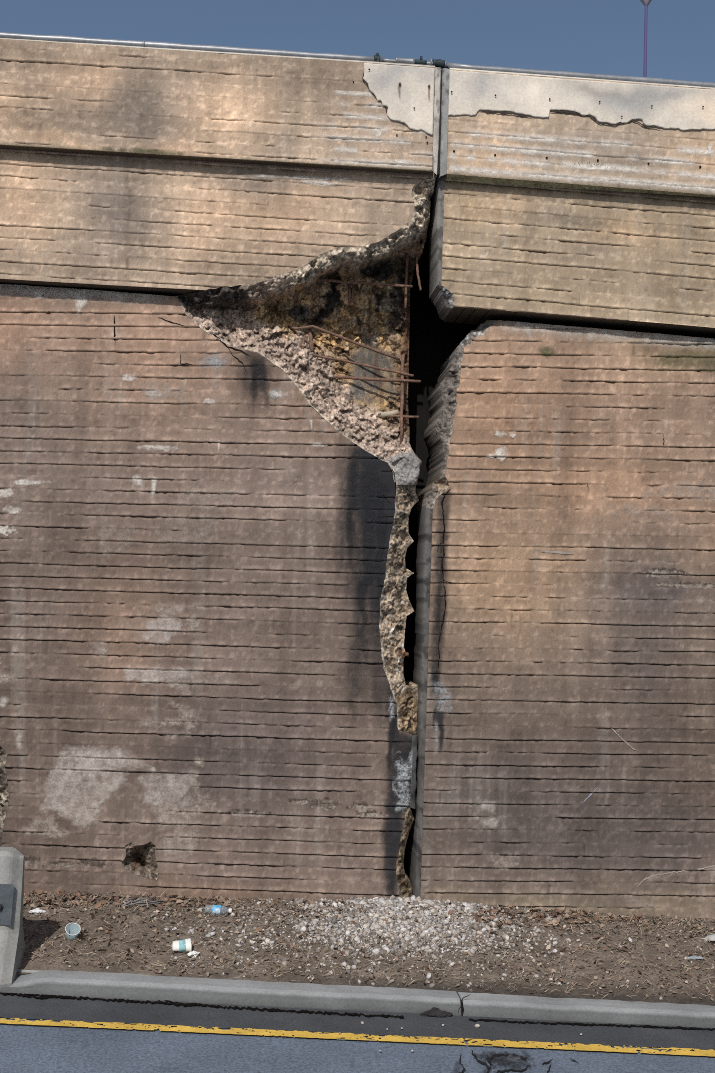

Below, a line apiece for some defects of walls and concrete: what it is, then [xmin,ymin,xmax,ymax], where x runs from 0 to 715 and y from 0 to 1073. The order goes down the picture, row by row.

flaking render [362,63,435,136]
flaking render [448,70,715,131]
leakage [244,356,282,399]
spalling [176,177,497,734]
leakage [342,447,396,659]
crack [437,489,451,668]
peeling [124,668,197,695]
spalling [0,746,10,846]
peeling [26,748,215,880]
crack [458,995,715,1030]
crack [450,1049,577,1073]